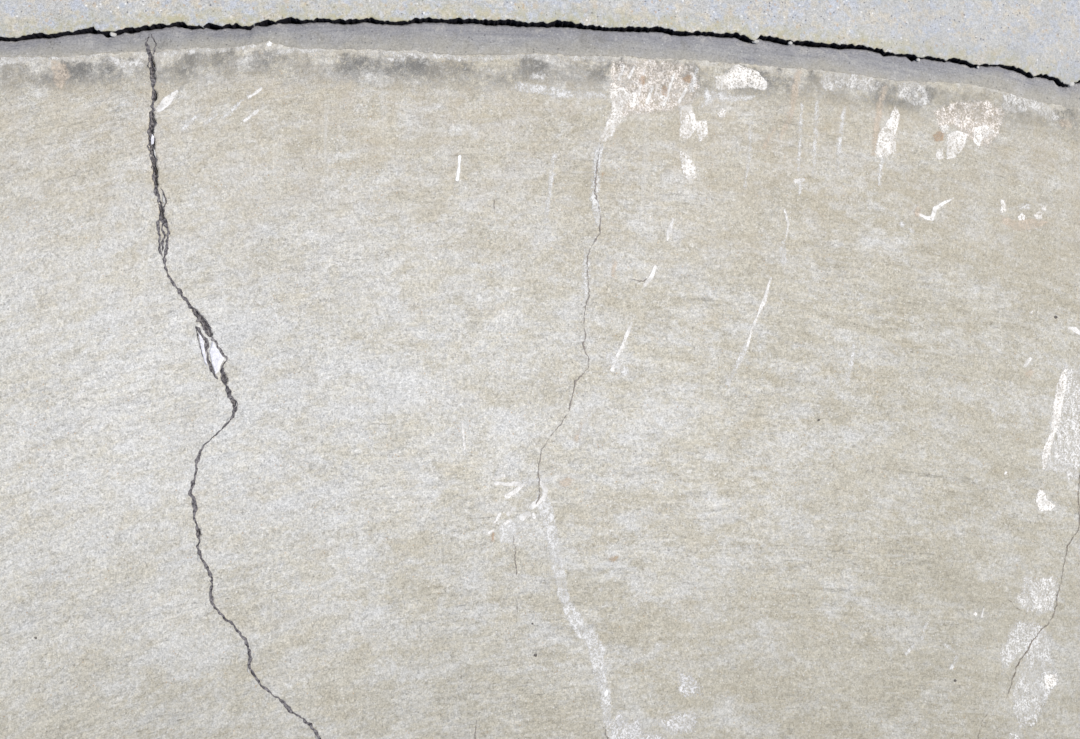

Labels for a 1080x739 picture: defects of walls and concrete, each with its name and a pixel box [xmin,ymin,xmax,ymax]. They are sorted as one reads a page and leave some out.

crack [145,34,321,739]
crack [0,17,1068,87]